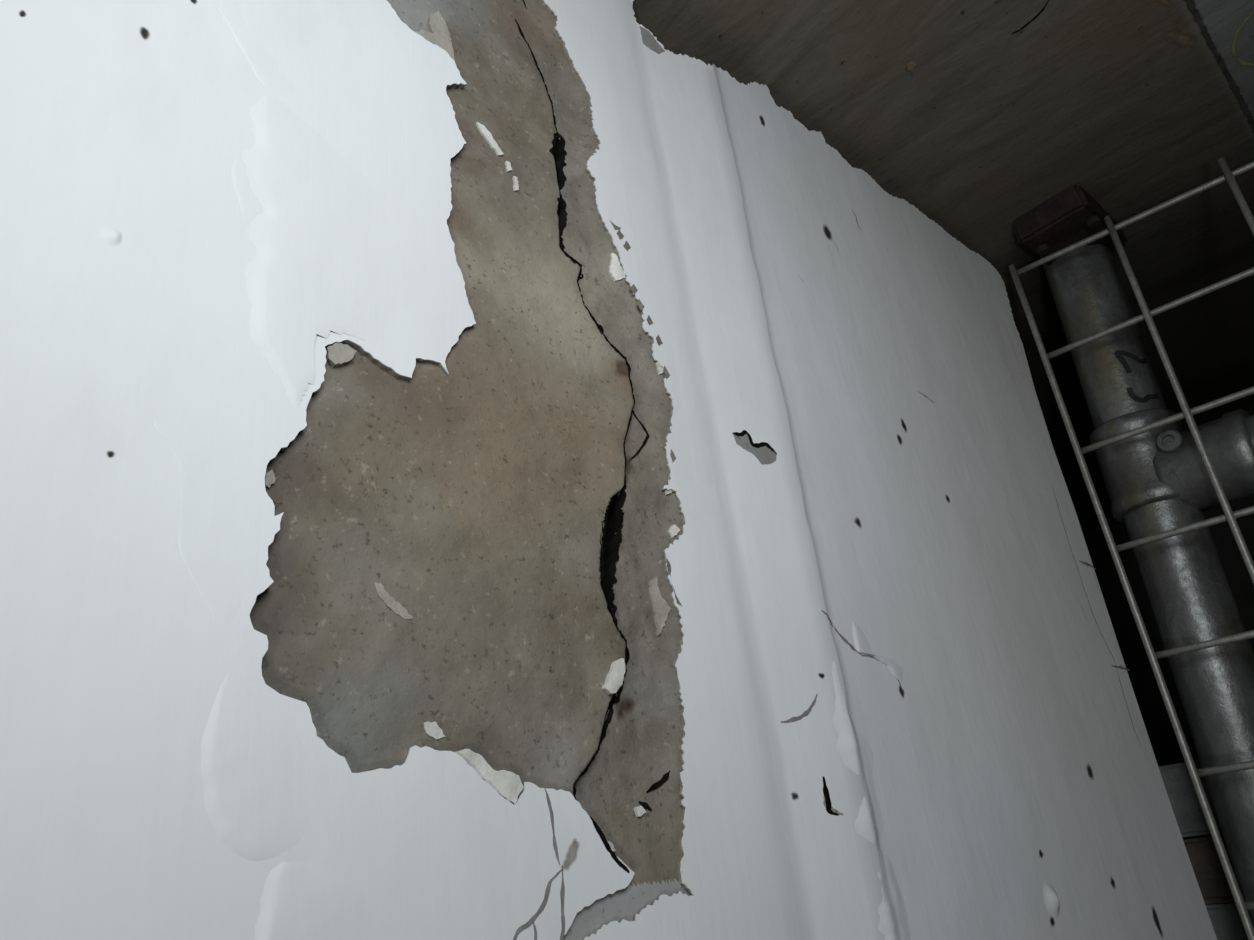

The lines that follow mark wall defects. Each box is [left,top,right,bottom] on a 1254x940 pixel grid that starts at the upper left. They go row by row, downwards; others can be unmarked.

flaking render [250,0,689,940]
crack [513,0,649,940]
crack [639,771,670,811]
peeling [733,430,777,465]